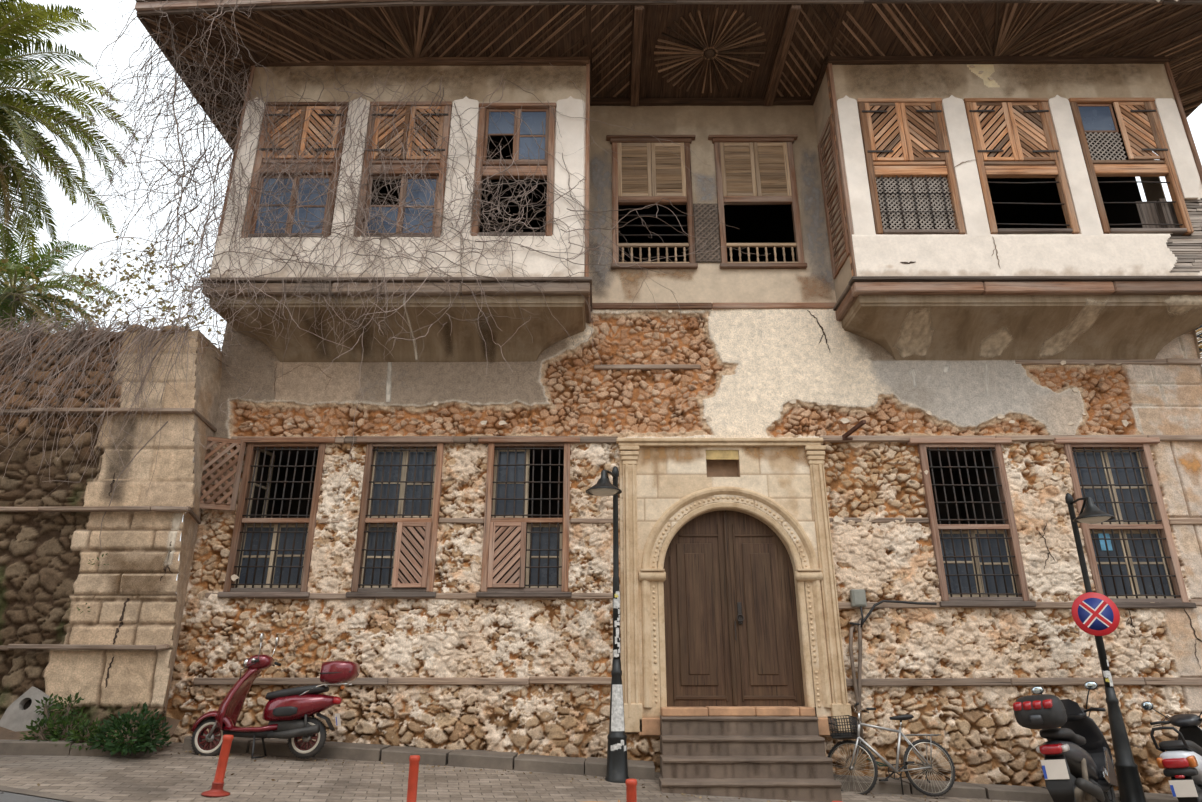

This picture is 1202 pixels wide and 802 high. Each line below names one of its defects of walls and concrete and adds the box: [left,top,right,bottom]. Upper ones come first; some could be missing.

flaking render [1136,198,1202,273]
flaking render [228,310,734,514]
peeling [896,309,933,358]
peeling [980,329,1012,357]
flaking render [1022,300,1141,435]
flaking render [766,394,1090,597]
crack [105,598,129,688]
crack [1184,609,1202,669]